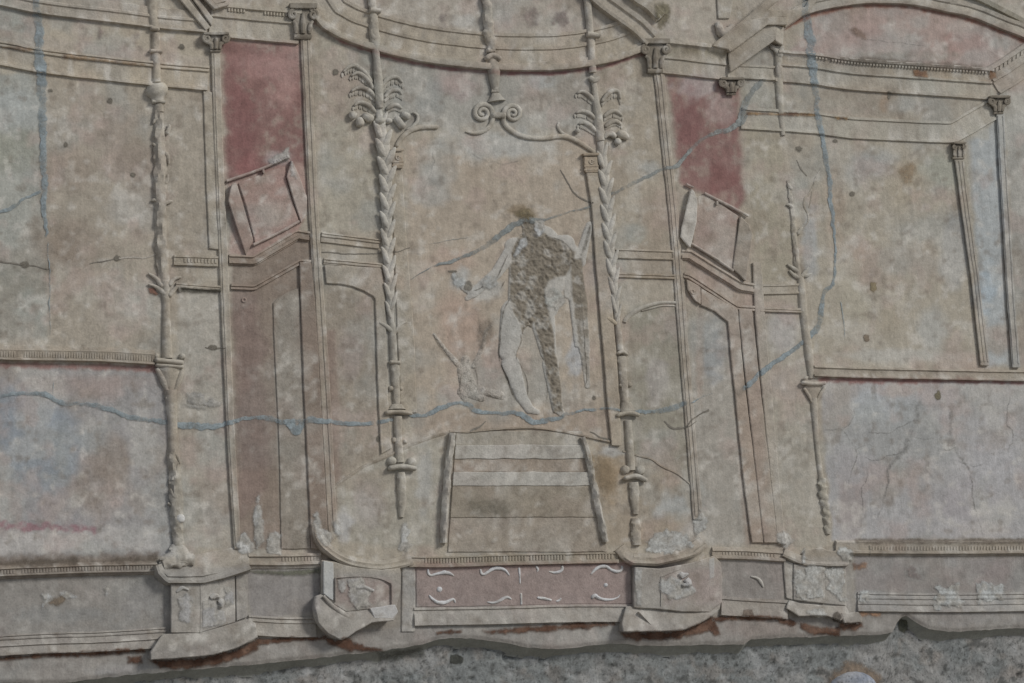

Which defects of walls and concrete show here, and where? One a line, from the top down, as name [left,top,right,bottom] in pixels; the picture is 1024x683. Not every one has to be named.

flaking render [514,220,545,256]
spalling [236,496,282,555]
spalling [777,531,870,622]
spalling [338,577,372,610]
flaking render [933,583,965,610]
corrosion [487,612,880,641]
corrosion [0,636,381,669]